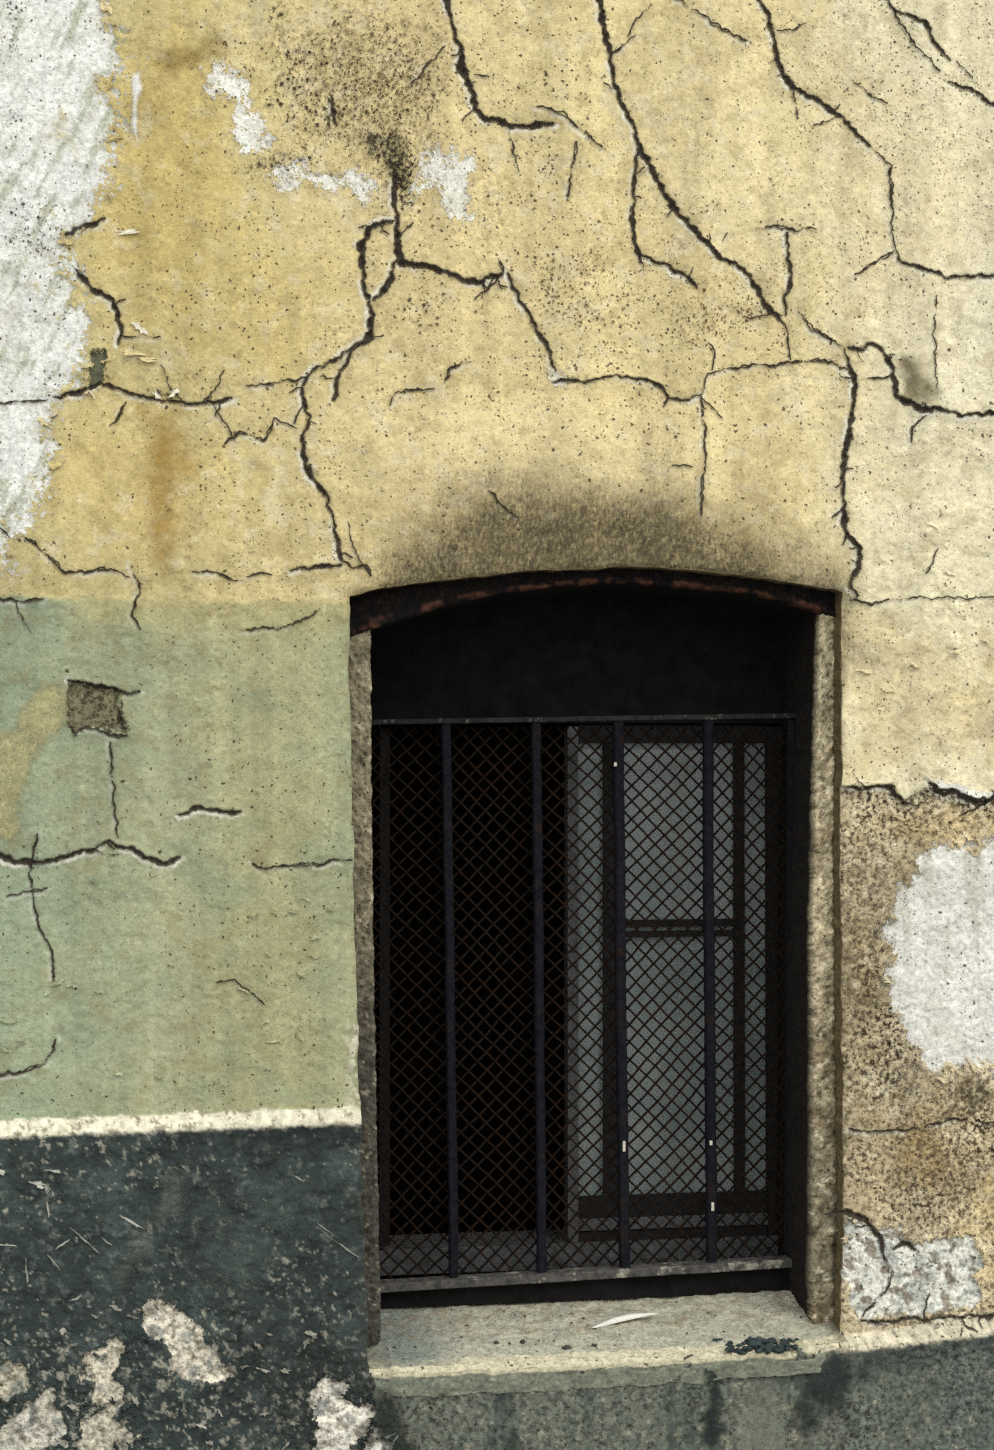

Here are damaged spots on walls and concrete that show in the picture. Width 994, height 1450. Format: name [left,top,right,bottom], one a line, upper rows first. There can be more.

water stain [237,8,444,214]
peeling [199,55,491,235]
peeling [0,0,159,595]
crack [0,0,994,606]
crack [0,527,141,633]
crack [0,680,181,982]
crack [178,805,242,816]
crack [847,771,994,816]
flaking render [875,812,994,1095]
spalling [840,1219,991,1326]
peeling [0,1298,291,1450]
peeling [290,1372,398,1450]